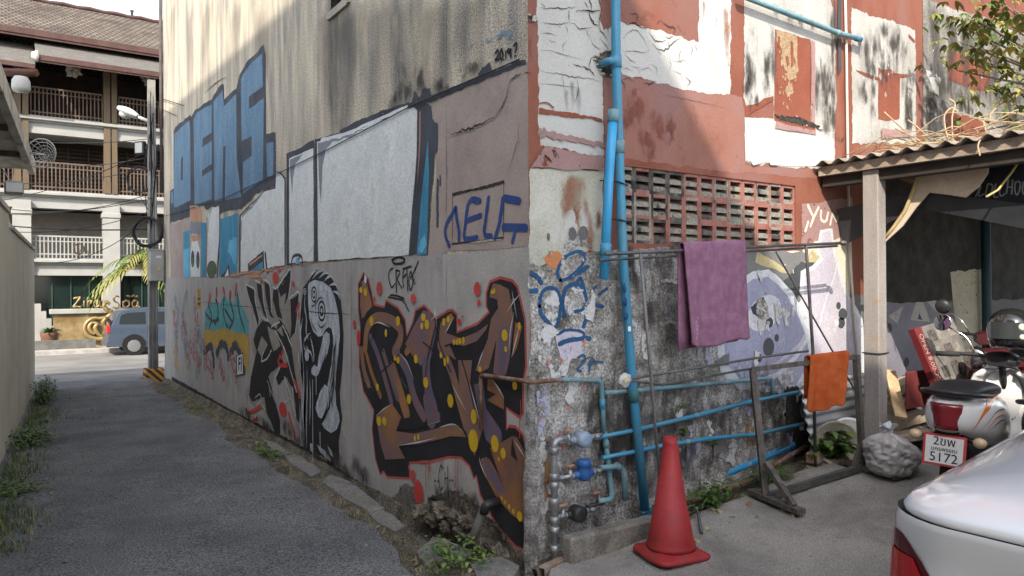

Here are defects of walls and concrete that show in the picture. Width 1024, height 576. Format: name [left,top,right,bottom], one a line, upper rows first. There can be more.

crack [446,0,718,285]
spalling [593,49,612,78]
peeling [774,30,823,130]
mould [861,24,907,109]
peeling [901,96,916,123]
peeling [926,47,941,95]
corrosion [565,178,600,249]